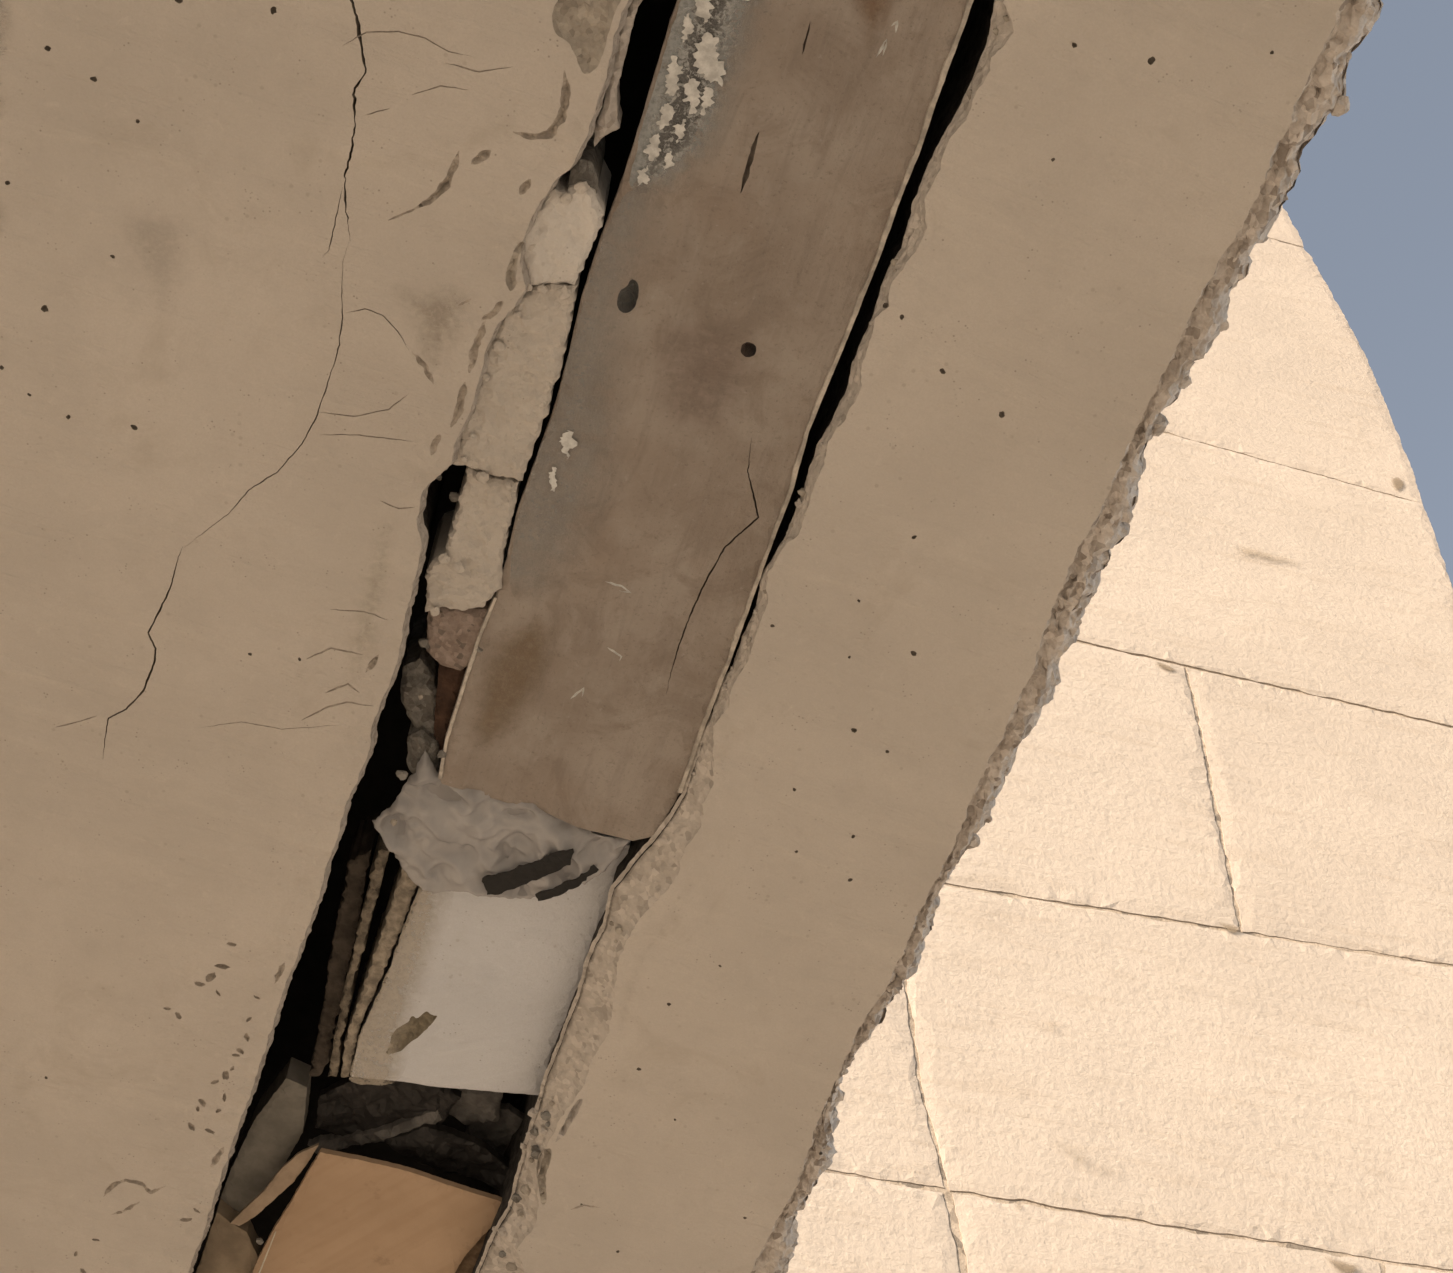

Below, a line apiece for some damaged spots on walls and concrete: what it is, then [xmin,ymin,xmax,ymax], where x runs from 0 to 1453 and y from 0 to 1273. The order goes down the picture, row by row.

crack [103,0,409,752]
spalling [180,0,633,1273]
crack [666,444,759,694]
spalling [475,0,1014,1273]